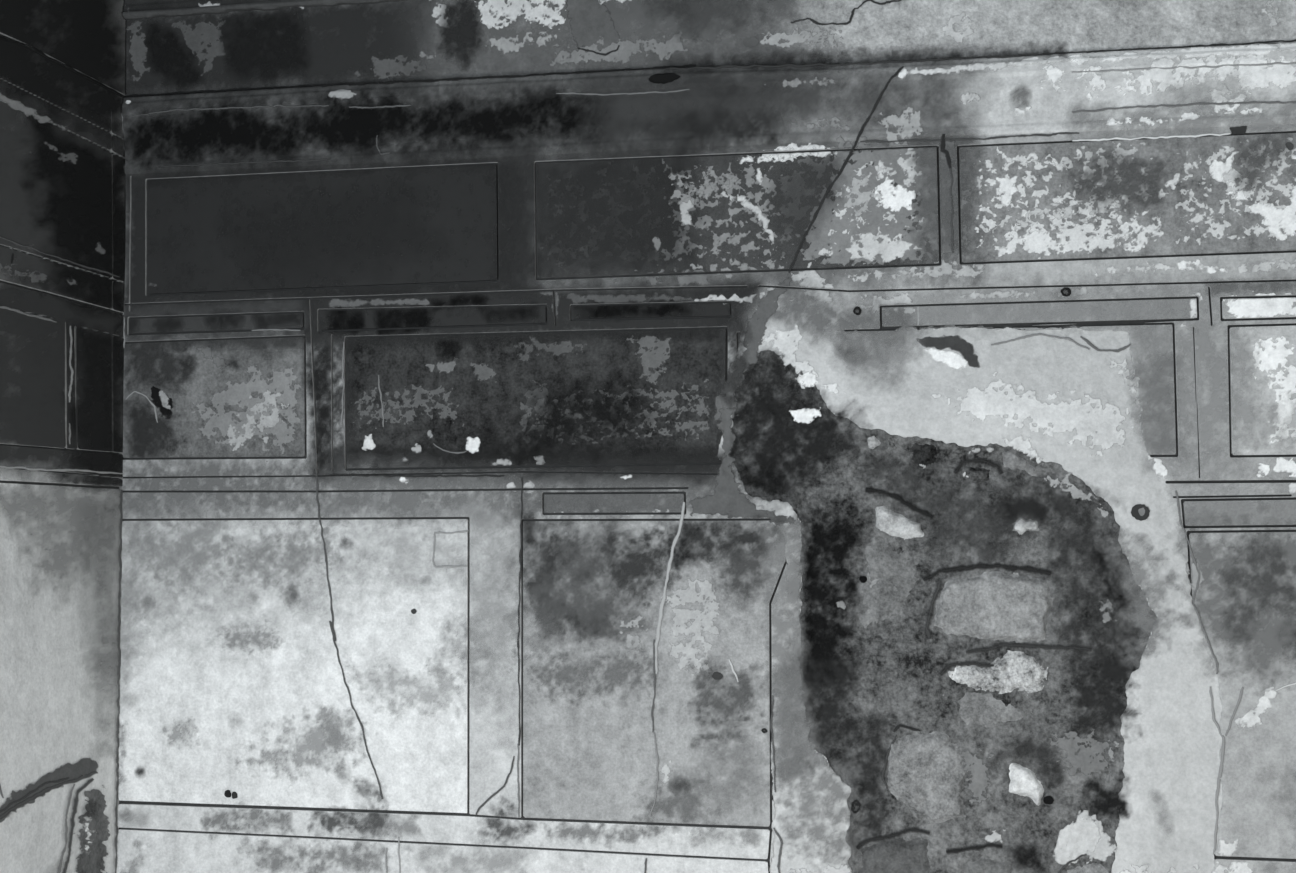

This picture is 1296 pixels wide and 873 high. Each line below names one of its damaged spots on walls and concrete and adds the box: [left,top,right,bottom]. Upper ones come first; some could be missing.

flaking render [432,3,448,27]
flaking render [760,26,843,49]
crack [767,0,901,25]
flaking render [898,0,1296,78]
flaking render [1107,85,1263,126]
crack [126,40,1296,273]
crack [339,342,347,428]
spalling [506,481,535,493]
spalling [514,106,1296,873]
damp [0,296,887,873]
crack [314,443,523,817]
crack [650,639,659,817]